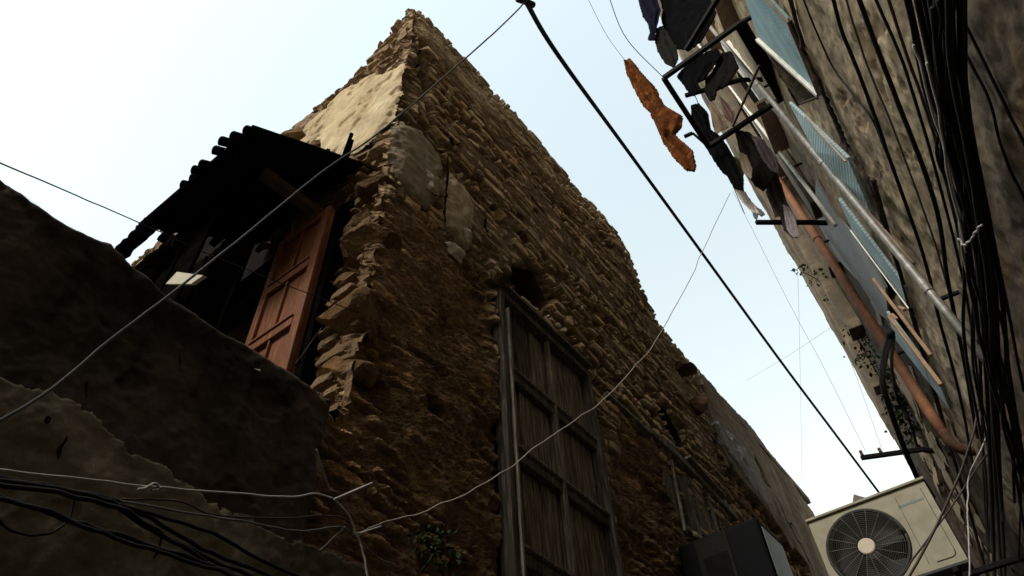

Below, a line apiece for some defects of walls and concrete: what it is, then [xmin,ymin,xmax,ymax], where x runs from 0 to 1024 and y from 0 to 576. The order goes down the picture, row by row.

spalling [292,11,417,129]
crack [428,123,459,238]
spalling [0,121,502,576]
spalling [610,425,686,576]